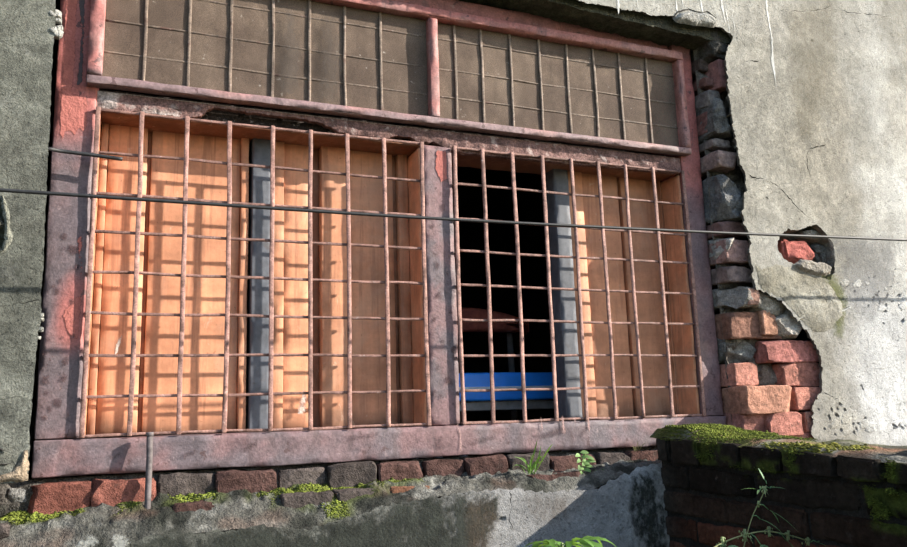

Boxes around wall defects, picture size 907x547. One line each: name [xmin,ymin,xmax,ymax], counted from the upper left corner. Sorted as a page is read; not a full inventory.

leakage [766,0,777,87]
spalling [0,195,13,251]
spalling [672,8,875,438]
spalling [0,488,27,517]
leakage [113,495,498,547]